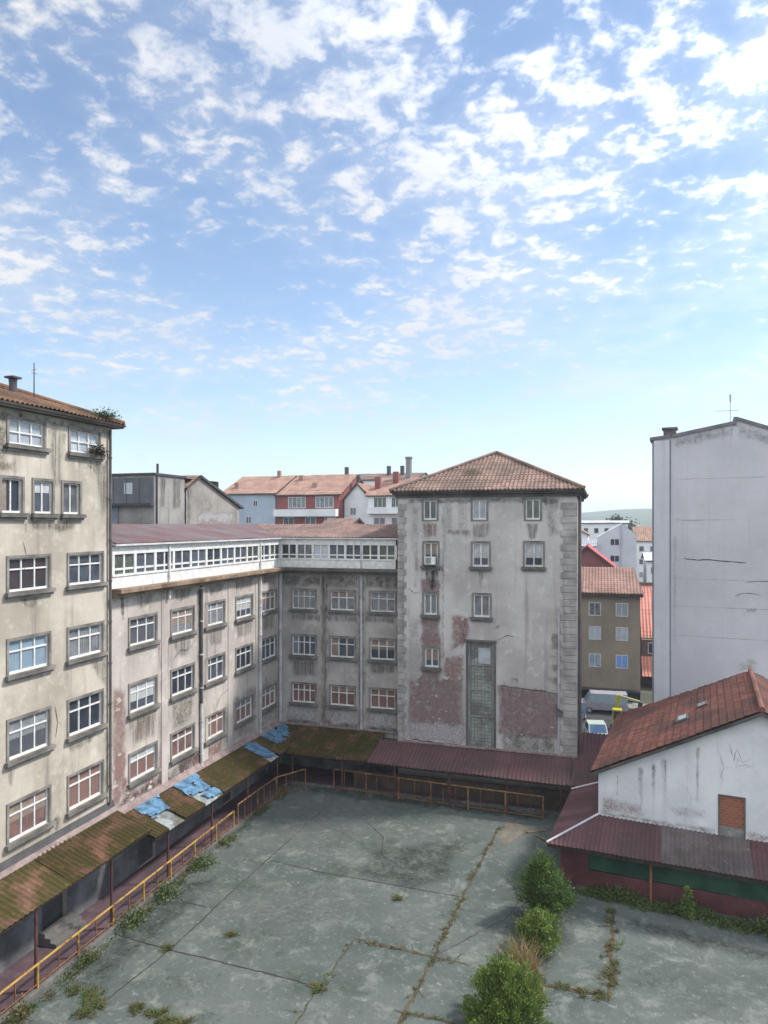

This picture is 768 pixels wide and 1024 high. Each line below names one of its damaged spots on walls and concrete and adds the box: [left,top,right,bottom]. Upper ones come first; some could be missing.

crack [684,558,768,596]
peeling [406,614,468,727]
peeling [498,686,558,738]
crack [83,802,520,1024]